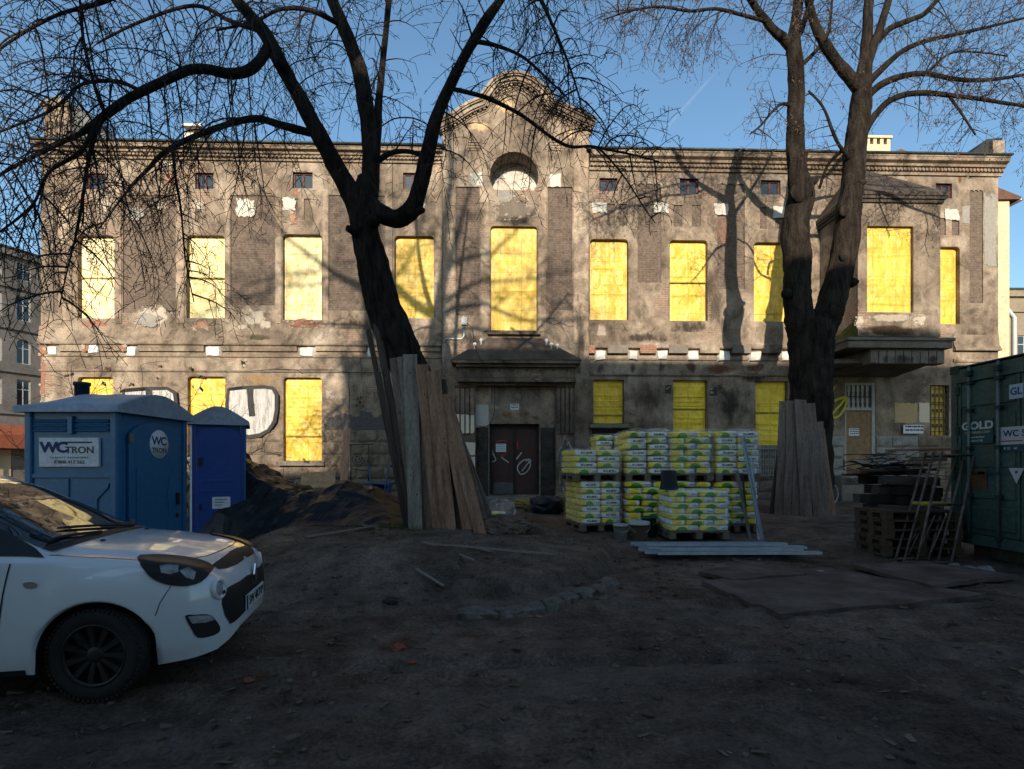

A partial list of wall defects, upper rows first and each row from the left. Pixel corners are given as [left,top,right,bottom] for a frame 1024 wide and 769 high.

flaking render [129,306,172,328]
flaking render [238,308,271,329]